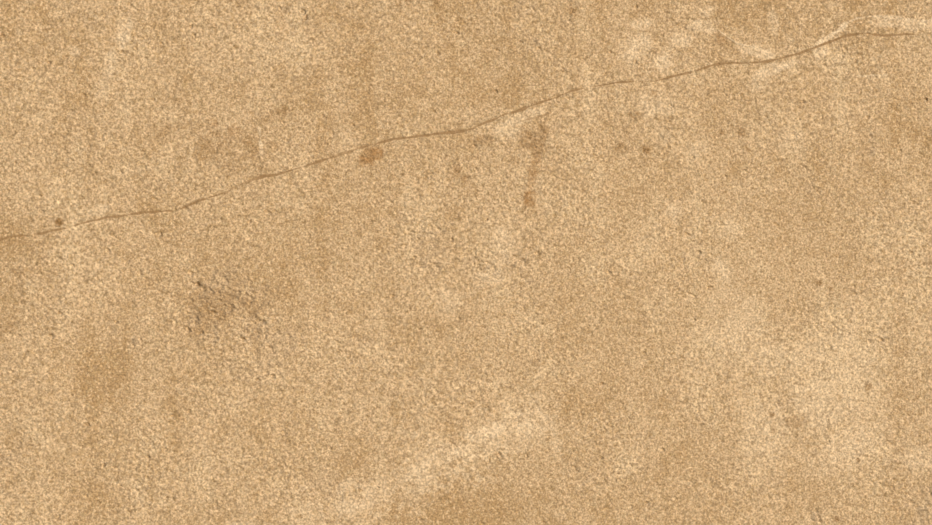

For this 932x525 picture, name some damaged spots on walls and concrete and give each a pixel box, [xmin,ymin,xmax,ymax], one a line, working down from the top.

crack [0,30,918,241]